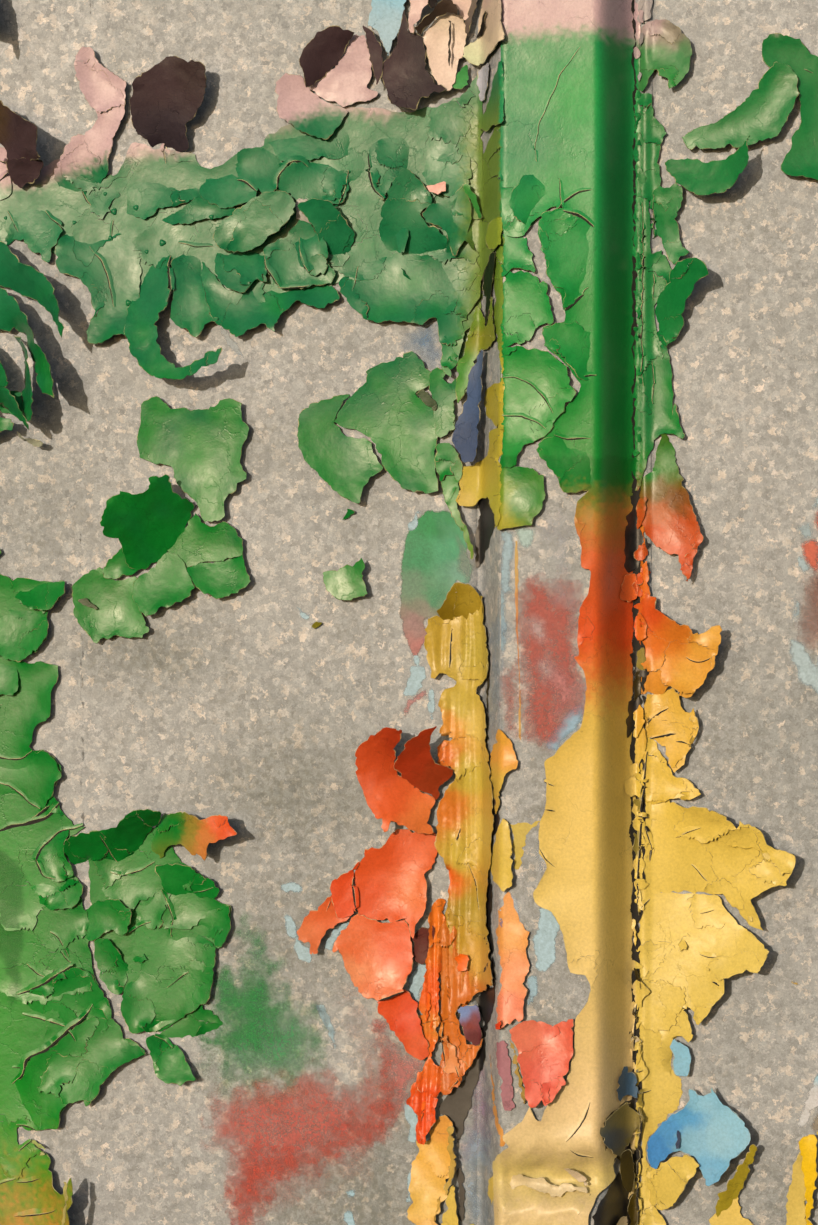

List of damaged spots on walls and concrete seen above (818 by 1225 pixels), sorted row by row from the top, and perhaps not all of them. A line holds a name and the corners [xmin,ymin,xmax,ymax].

crack [533,46,595,227]
peeling [0,47,505,559]
crack [563,286,589,311]
crack [638,196,657,404]
crack [502,375,591,440]
peeling [275,0,818,1225]
crack [0,750,213,937]
peeling [0,396,251,1225]
crack [11,931,93,1084]
crack [167,971,189,988]